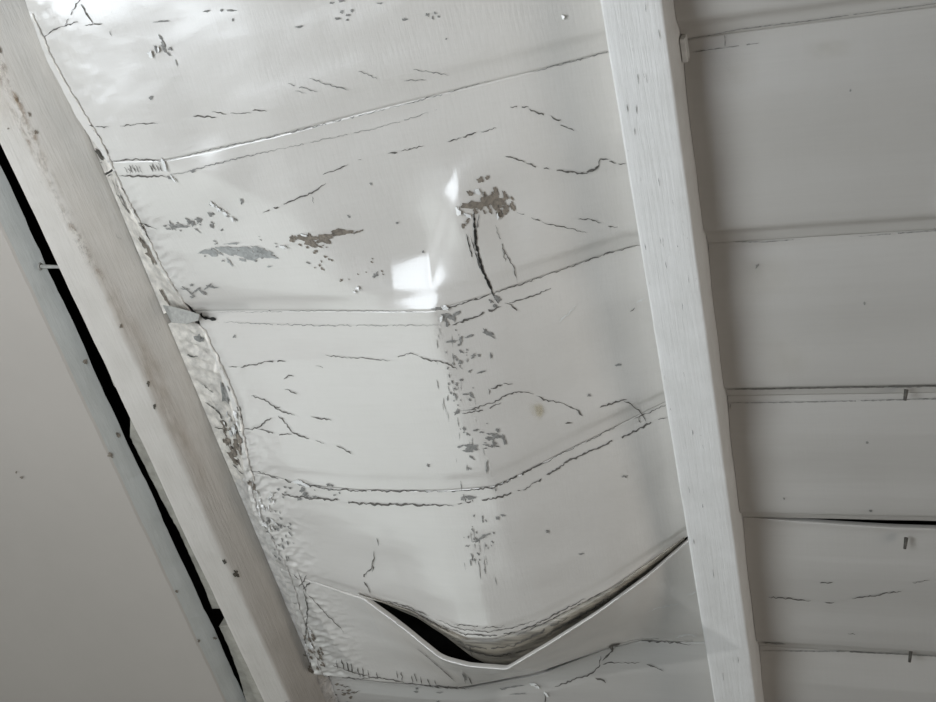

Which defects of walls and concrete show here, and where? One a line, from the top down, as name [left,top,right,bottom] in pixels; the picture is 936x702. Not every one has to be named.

crack [511,106,574,131]
crack [100,69,489,242]
crack [505,156,624,174]
peeling [163,201,237,233]
peeling [455,176,515,229]
peeling [199,228,363,270]
crack [199,213,678,507]
peeling [220,382,242,465]
peeling [247,479,340,561]
peeling [303,628,325,674]
crack [333,540,637,702]
crack [544,641,687,702]